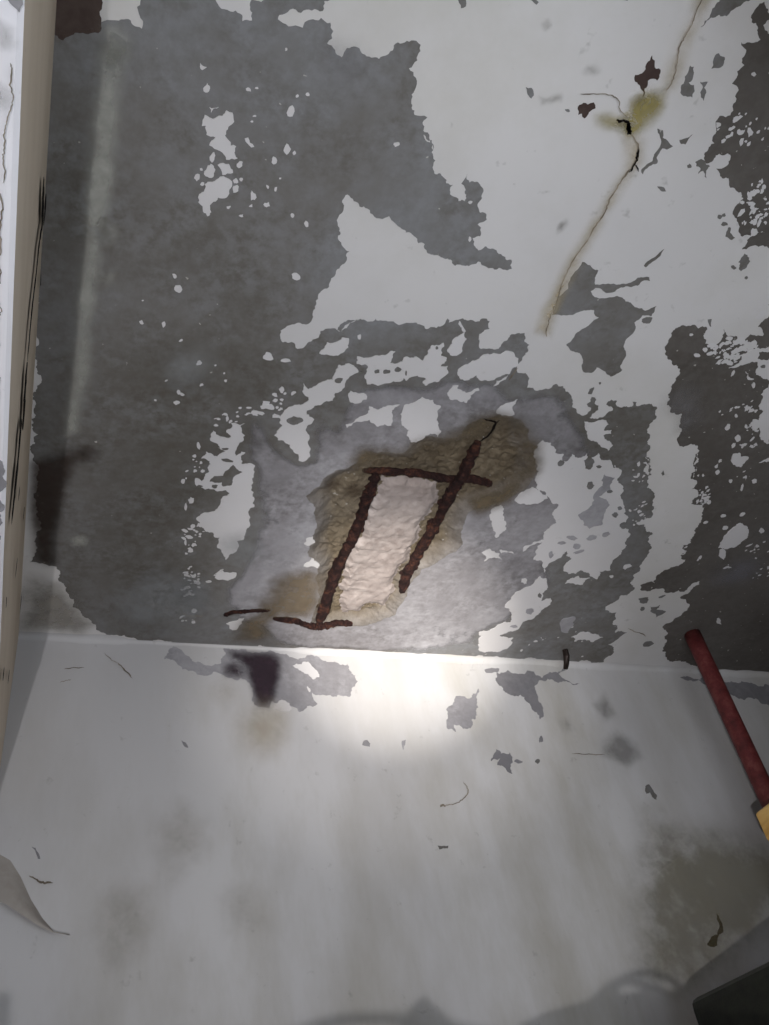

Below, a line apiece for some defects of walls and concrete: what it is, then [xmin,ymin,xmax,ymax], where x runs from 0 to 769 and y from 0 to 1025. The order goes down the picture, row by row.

crack [666,0,702,91]
crack [0,63,14,315]
crack [545,93,640,337]
crack [11,178,46,524]
peeling [30,0,769,719]
peeling [446,689,479,732]
peeling [491,749,540,774]